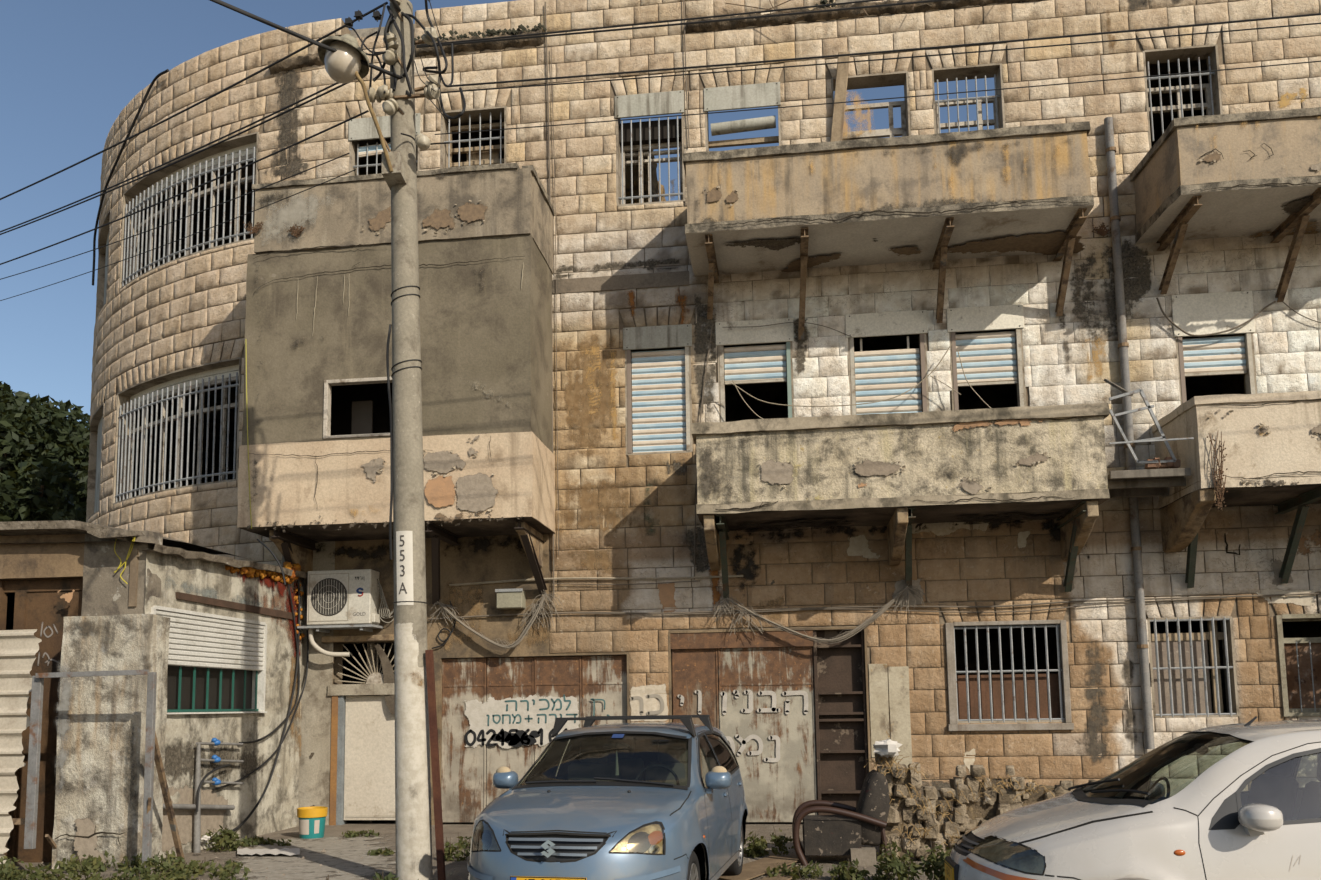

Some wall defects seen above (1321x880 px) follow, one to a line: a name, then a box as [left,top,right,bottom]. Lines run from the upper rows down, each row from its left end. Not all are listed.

damp [260,70,330,240]
crack [1190,143,1321,192]
damp [889,231,1151,381]
damp [565,335,617,455]